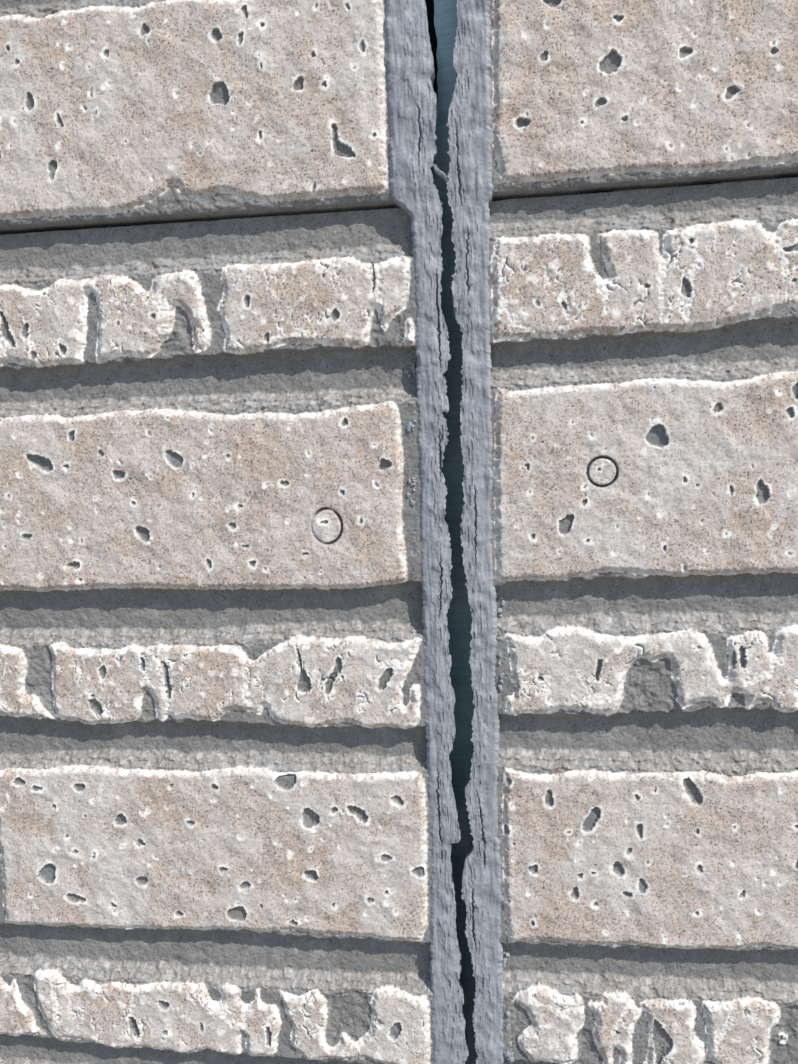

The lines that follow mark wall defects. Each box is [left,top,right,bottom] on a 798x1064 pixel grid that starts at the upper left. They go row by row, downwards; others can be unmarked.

crack [416,0,486,1064]